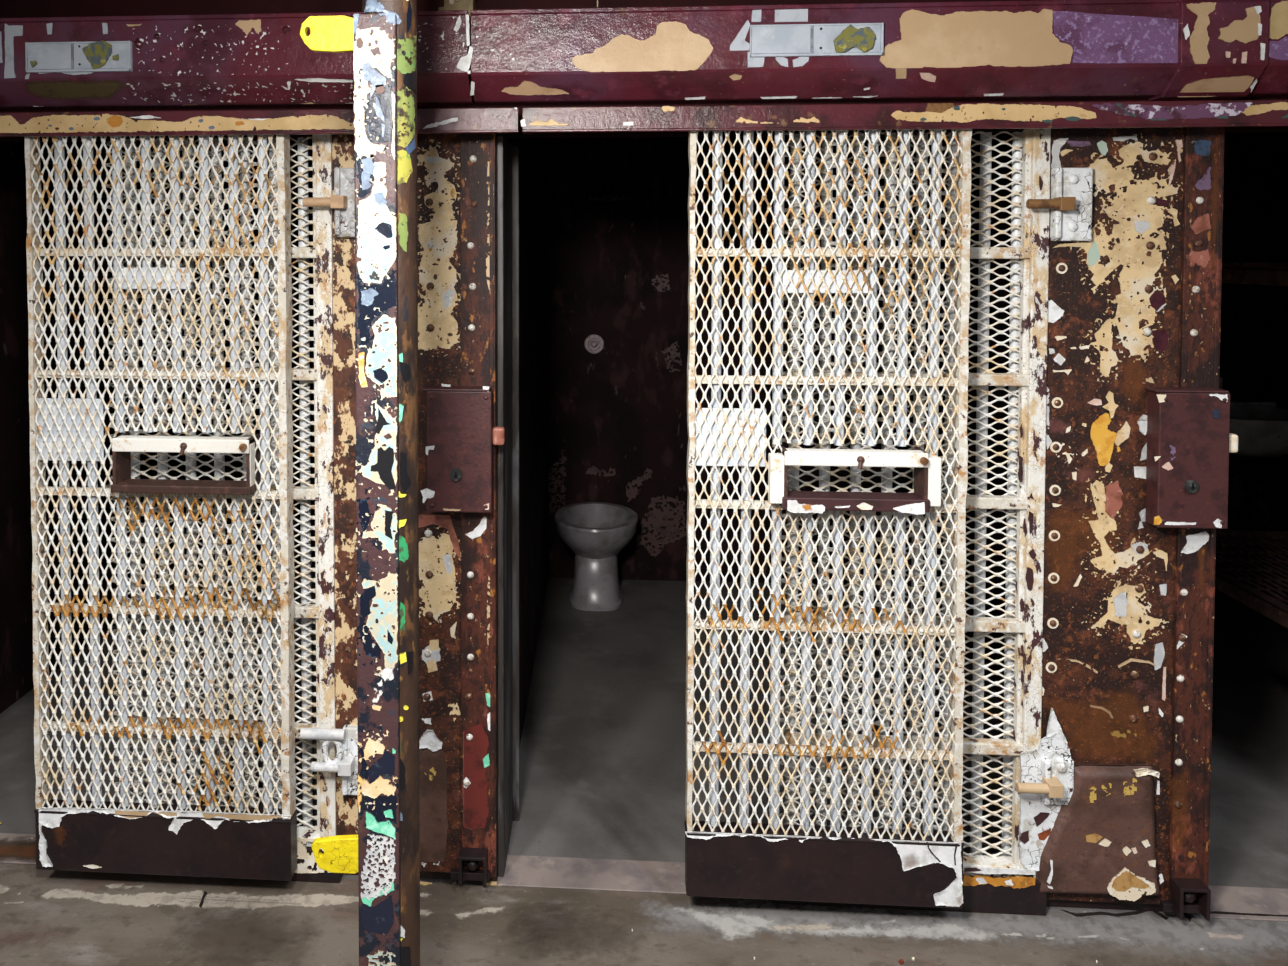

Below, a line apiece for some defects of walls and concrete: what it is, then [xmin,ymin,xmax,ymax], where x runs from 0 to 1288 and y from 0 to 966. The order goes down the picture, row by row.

peeling [572,21,713,72]
peeling [0,0,489,711]
peeling [879,1,1288,717]
rust [50,497,281,622]
rust [706,593,907,642]
rust [701,730,731,765]
rust [774,724,898,769]
peeling [1019,687,1071,889]
peeling [38,807,292,867]
peeling [357,705,448,966]
peeling [872,839,964,907]
peeling [1085,833,1164,901]